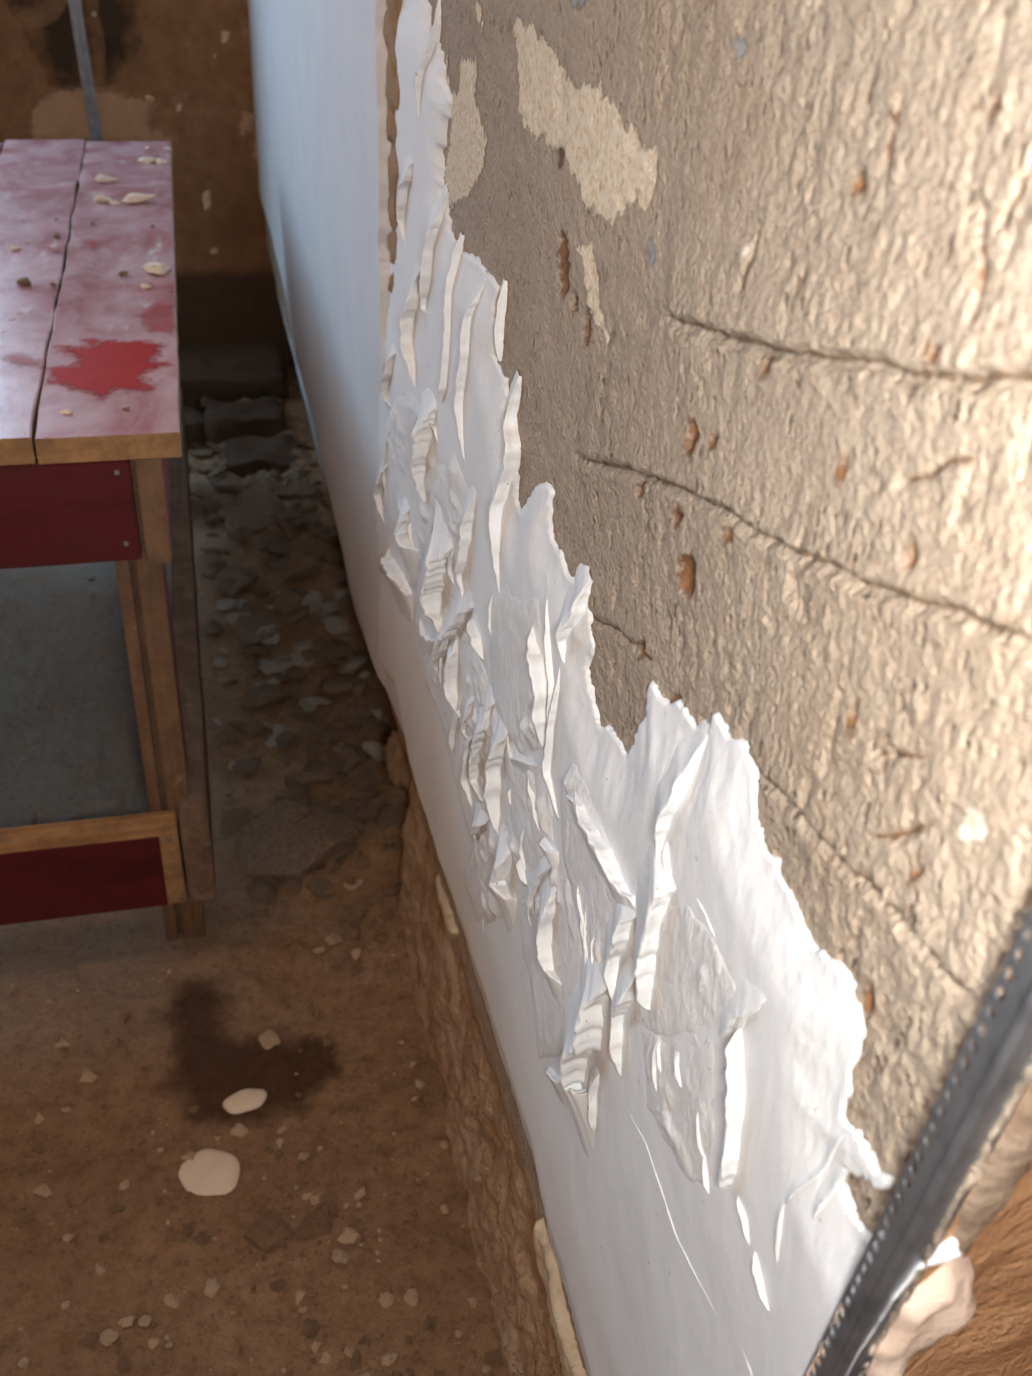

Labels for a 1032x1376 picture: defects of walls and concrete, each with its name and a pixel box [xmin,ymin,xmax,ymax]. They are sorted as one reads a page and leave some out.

spalling [444,54,488,210]
spalling [513,16,658,227]
spalling [852,172,867,196]
spalling [556,232,610,346]
crack [670,314,1032,384]
hole [682,419,719,456]
spalling [836,457,848,483]
crack [586,456,1031,638]
hole [676,554,696,595]
crack [593,615,652,660]
spalling [846,702,858,740]
spalling [863,985,875,1014]